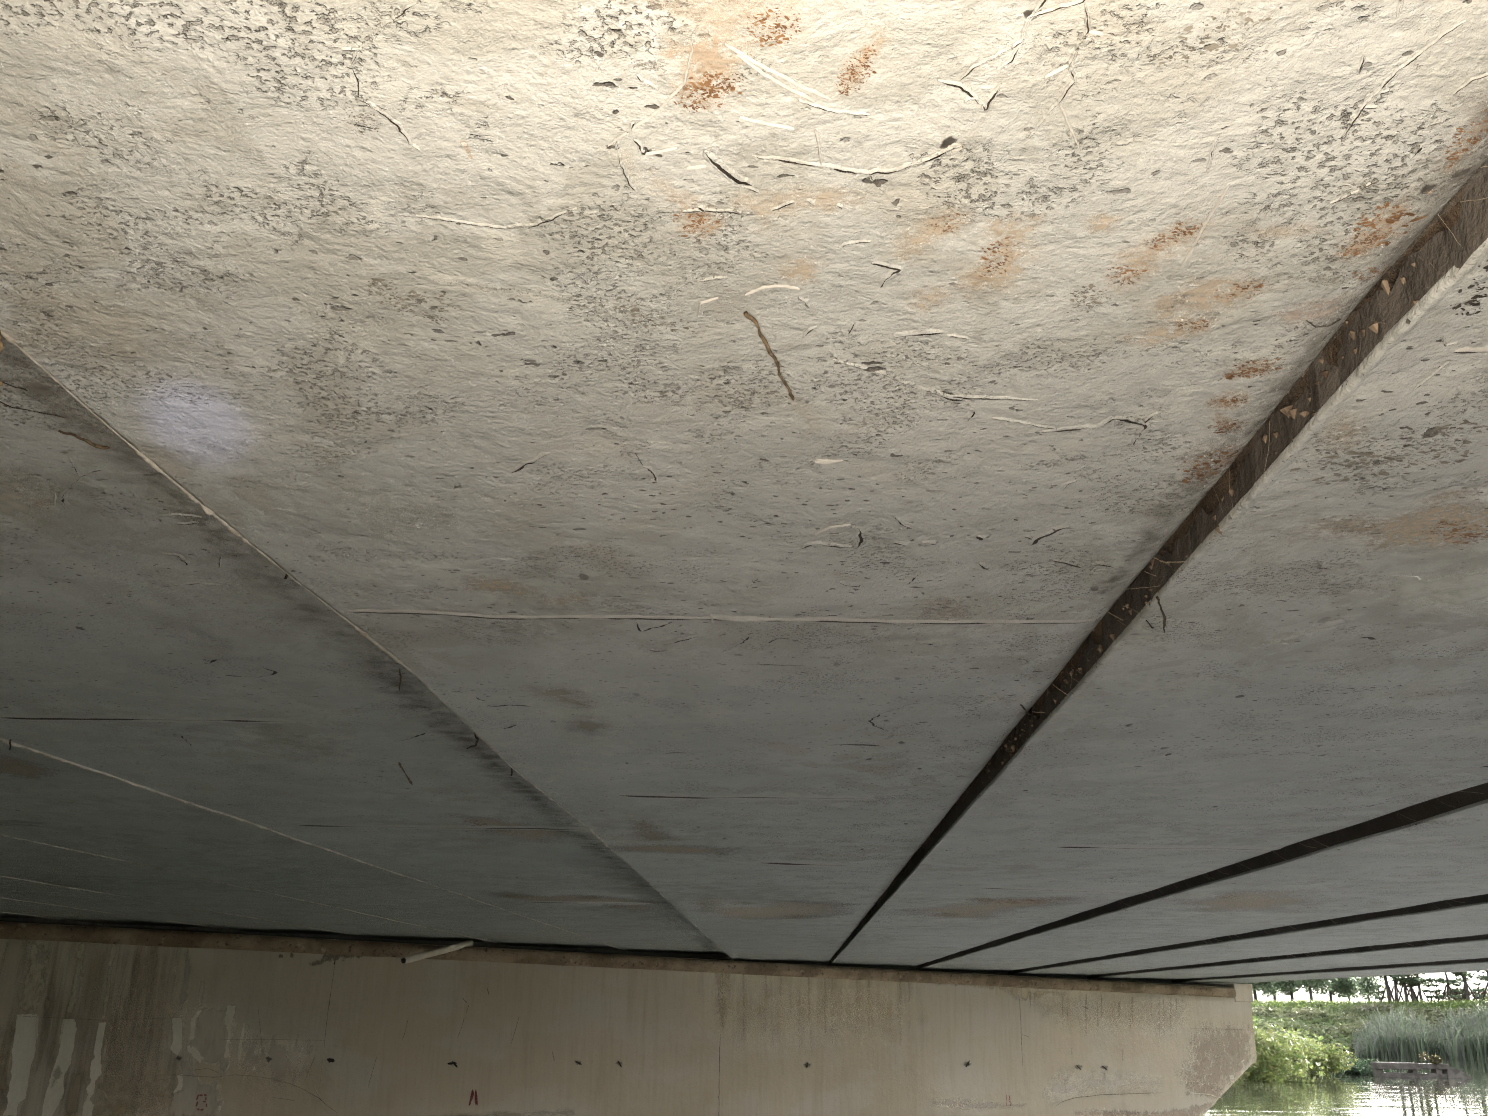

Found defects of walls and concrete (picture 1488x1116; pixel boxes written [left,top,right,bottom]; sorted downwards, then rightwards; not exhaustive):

corrosion [742,7,802,47]
crack [341,1,422,153]
corrosion [669,38,747,113]
corrosion [836,39,882,96]
crack [937,0,1104,152]
crack [1342,20,1467,137]
corrosion [960,217,1037,287]
corrosion [1107,219,1202,286]
corrosion [1278,202,1429,321]
corrosion [1177,357,1286,483]
corrosion [1322,494,1488,547]